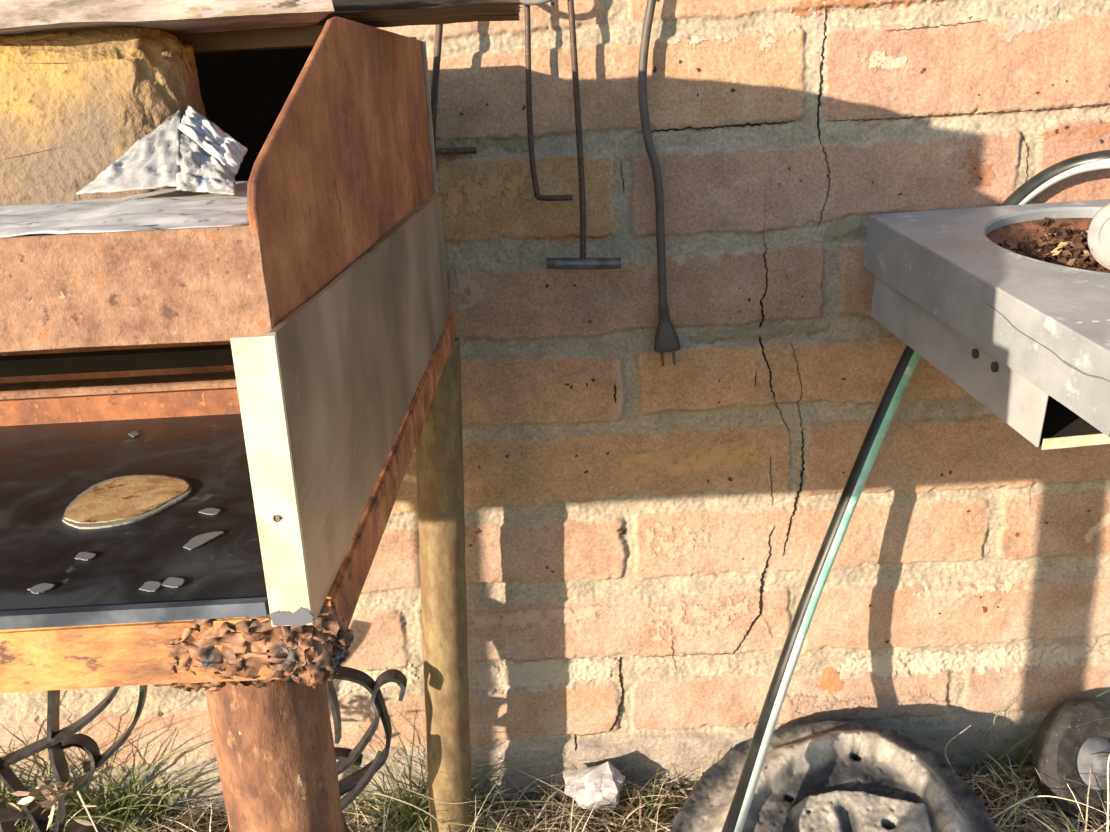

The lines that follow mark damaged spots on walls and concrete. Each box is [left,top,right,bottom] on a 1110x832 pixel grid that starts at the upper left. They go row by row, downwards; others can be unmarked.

crack [574,198,805,751]